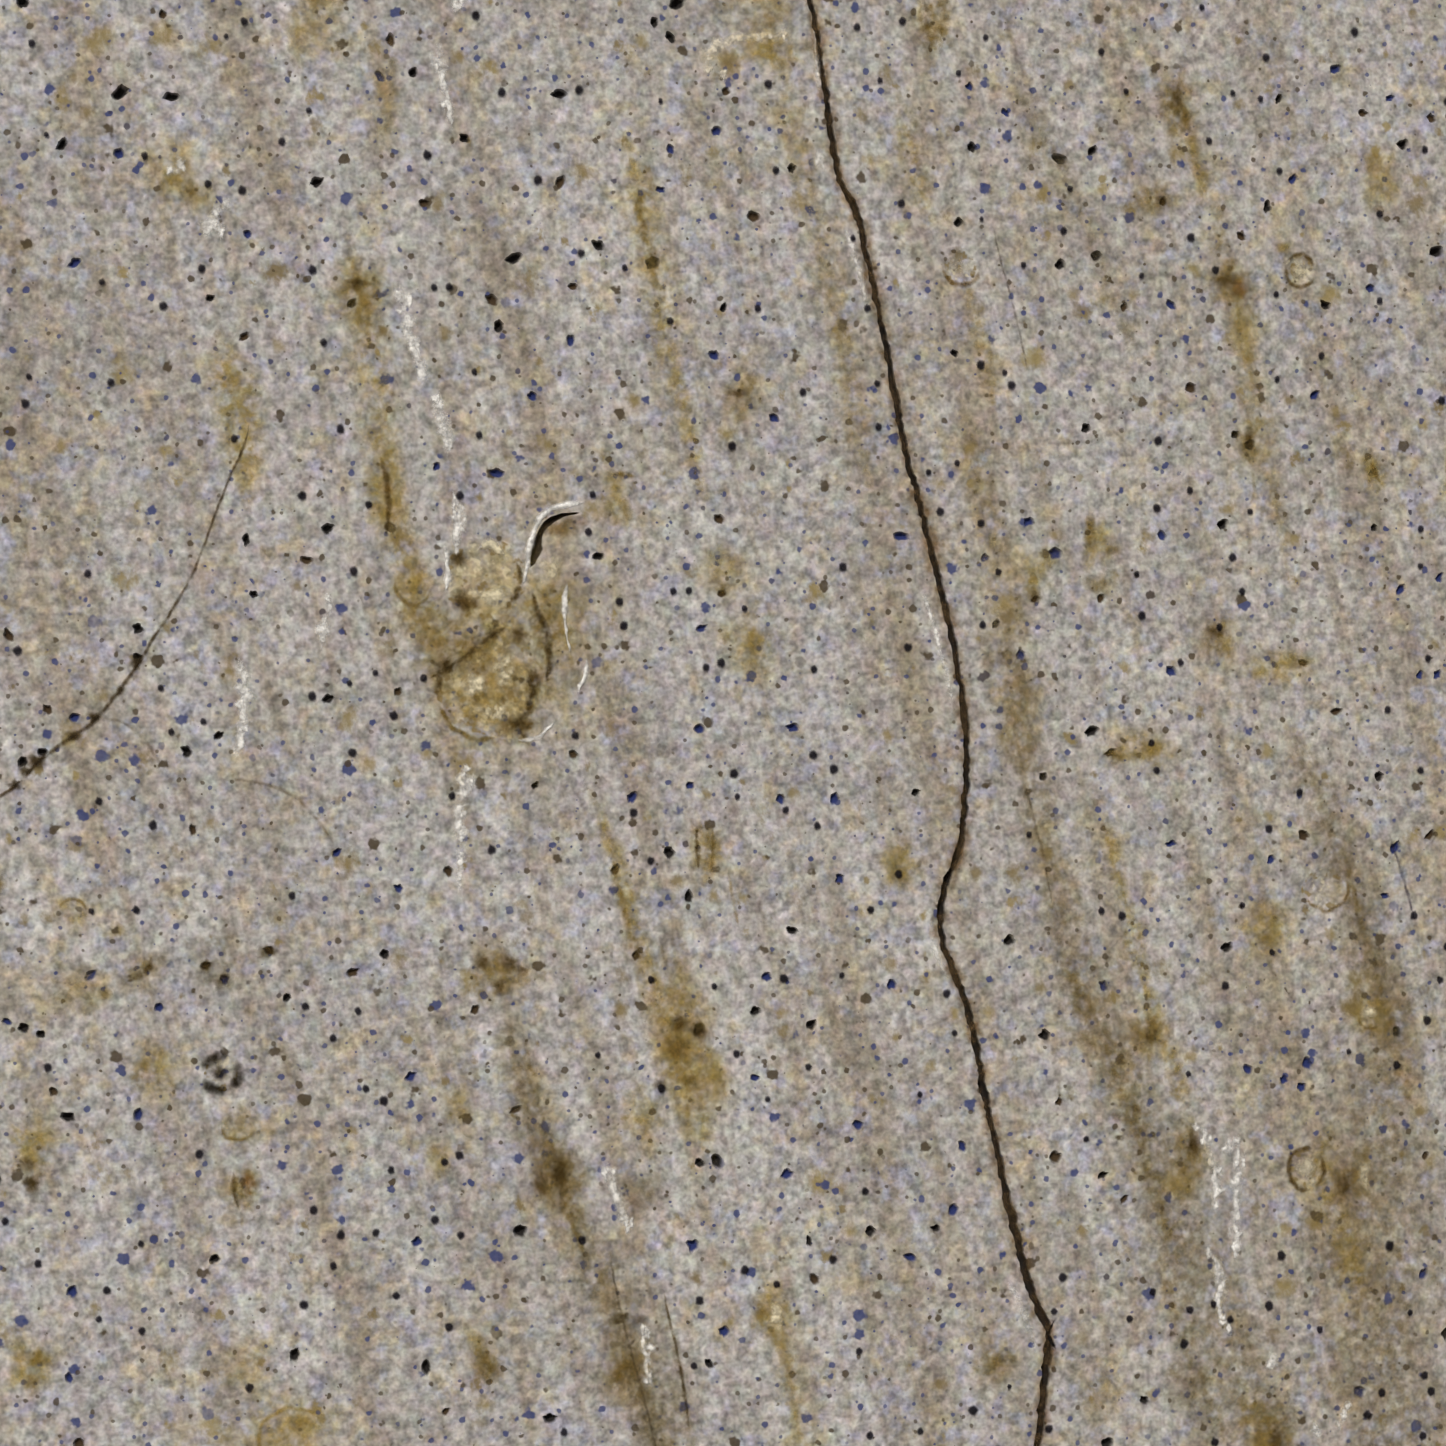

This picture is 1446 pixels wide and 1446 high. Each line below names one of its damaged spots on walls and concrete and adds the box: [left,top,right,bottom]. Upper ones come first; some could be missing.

spalling [434,502,579,743]
crack [807,0,1055,1446]